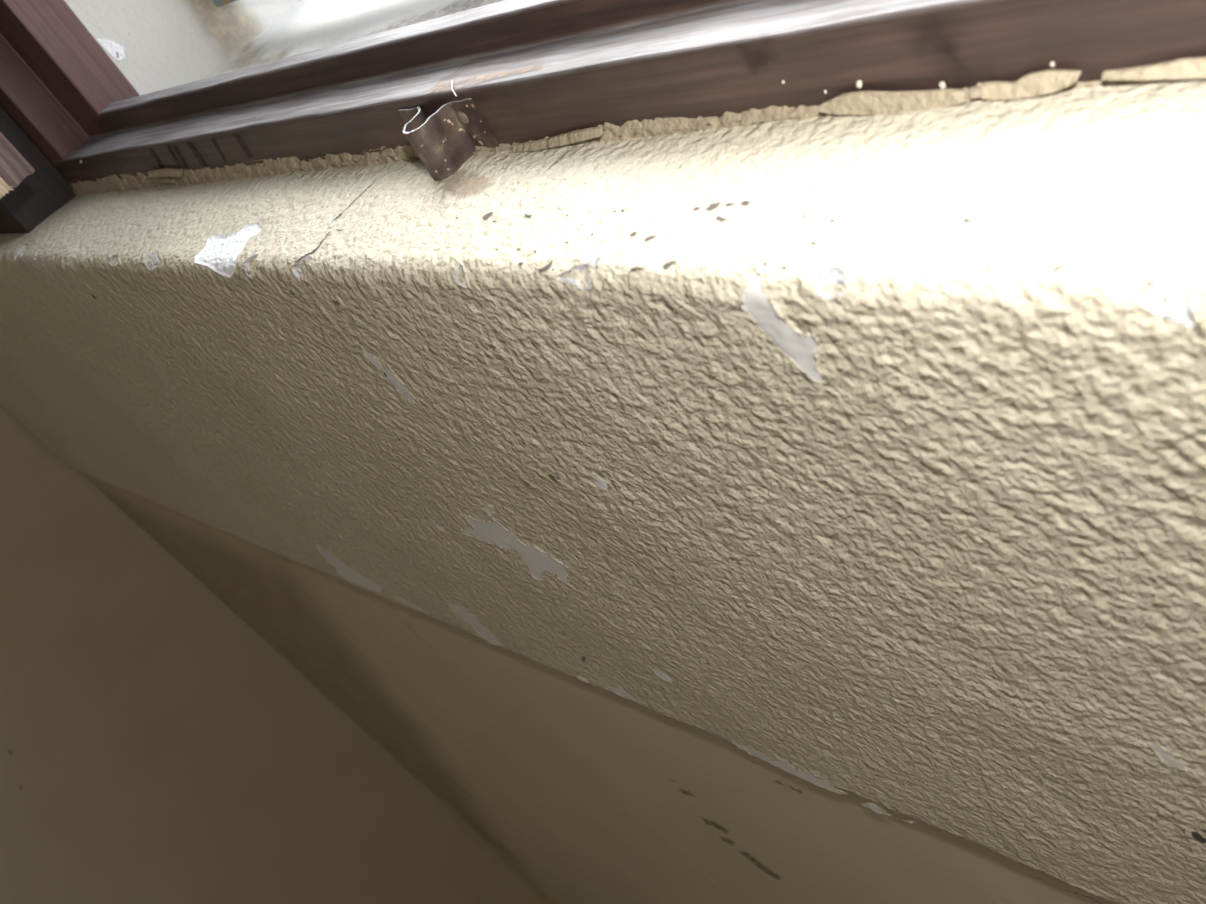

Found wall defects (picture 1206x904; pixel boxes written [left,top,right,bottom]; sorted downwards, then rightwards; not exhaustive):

flaking render [194,222,264,281]
crack [291,183,374,296]
flaking render [538,256,606,293]
flaking render [693,201,750,222]
peeling [740,262,826,385]
peeling [427,498,570,585]
peeling [314,543,504,647]